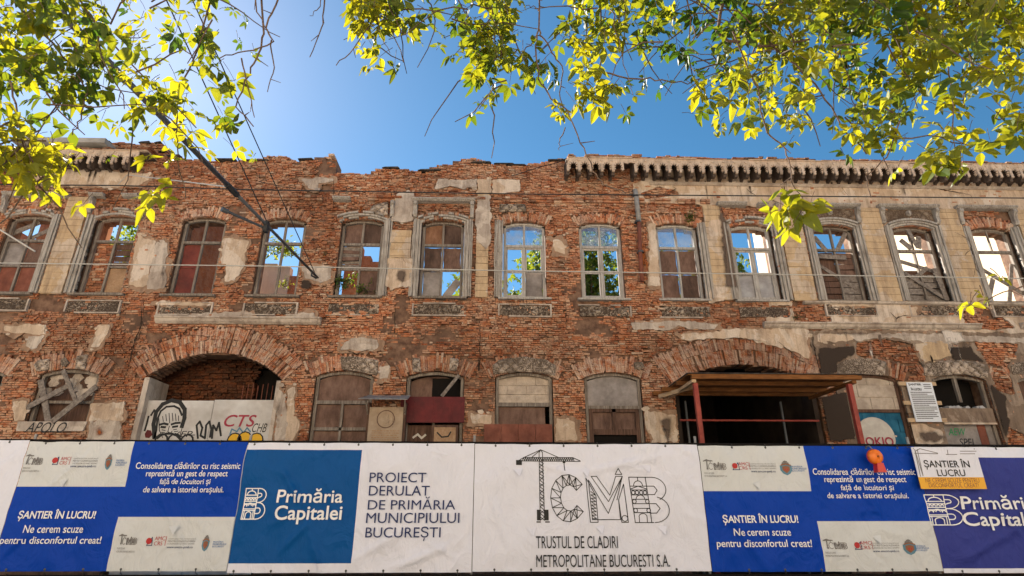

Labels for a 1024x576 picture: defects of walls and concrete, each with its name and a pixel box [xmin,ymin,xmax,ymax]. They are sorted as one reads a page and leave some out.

flaking render [33,169,154,191]
flaking render [298,175,338,193]
flaking render [392,190,414,224]
flaking render [435,177,520,249]
spalling [292,309,367,321]
flaking render [0,322,51,354]
flaking render [87,323,114,352]
flaking render [337,334,391,384]
flaking render [630,299,1024,395]
flaking render [86,399,129,440]
flaking render [272,382,306,441]